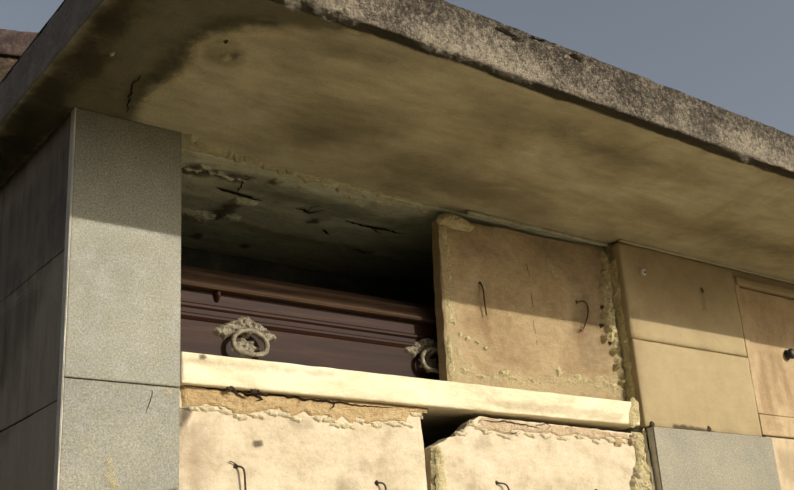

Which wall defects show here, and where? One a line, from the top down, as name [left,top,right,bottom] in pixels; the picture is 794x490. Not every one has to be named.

crack [126,76,141,113]
water stain [0,0,794,189]
peeling [182,162,252,182]
peeling [181,197,259,223]
crack [298,206,330,235]
crack [346,221,407,235]
crack [186,385,392,410]
peeling [180,385,428,430]
peeling [455,418,655,490]